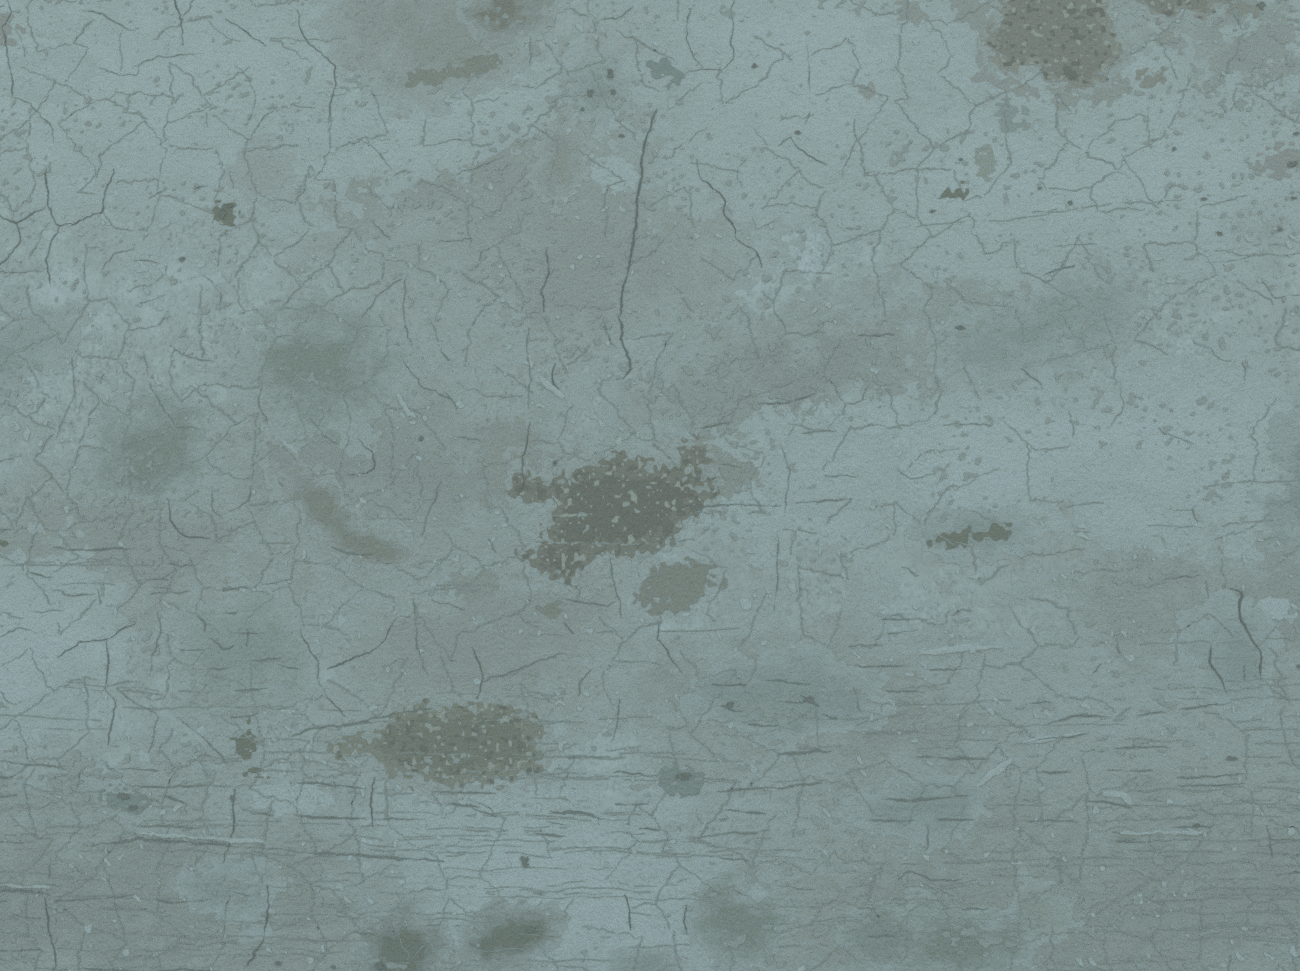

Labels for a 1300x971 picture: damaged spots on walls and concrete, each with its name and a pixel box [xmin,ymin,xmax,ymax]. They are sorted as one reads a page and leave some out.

spalling [893,0,1266,111]
crack [1032,9,1191,214]
crack [1220,0,1300,122]
crack [753,0,1124,511]
crack [1134,195,1286,355]
crack [1237,279,1300,350]
crack [0,0,792,971]
spalling [499,428,763,615]
crack [1249,398,1277,485]
spalling [313,684,571,806]
crack [525,448,1300,971]